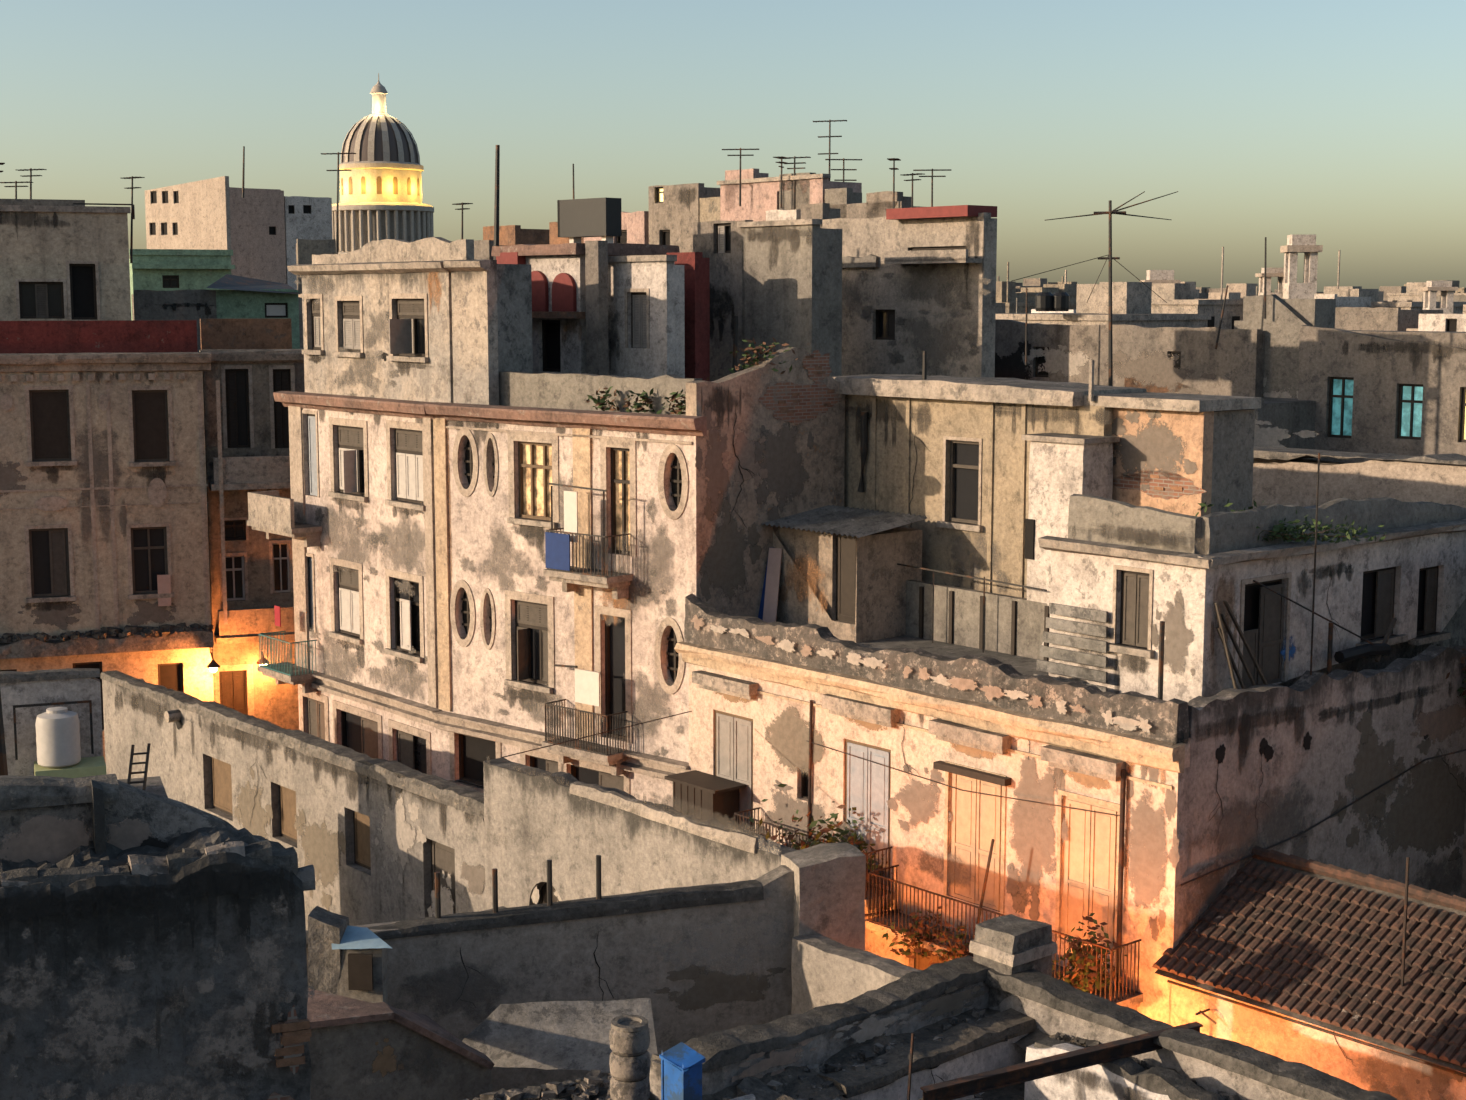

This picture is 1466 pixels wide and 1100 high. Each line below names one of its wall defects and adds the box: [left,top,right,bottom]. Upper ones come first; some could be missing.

crack [728,403,755,528]
flaking render [1112,410,1206,500]
flaking render [602,381,1152,733]
flaking render [1151,591,1195,676]
flaking render [498,682,574,727]
leakage [0,865,295,965]
flaking render [0,767,346,911]
flaking render [886,764,952,831]
flaking render [1006,744,1068,921]
flaking render [1115,765,1180,941]
flaking render [0,957,53,1042]
flaking render [39,895,314,1100]